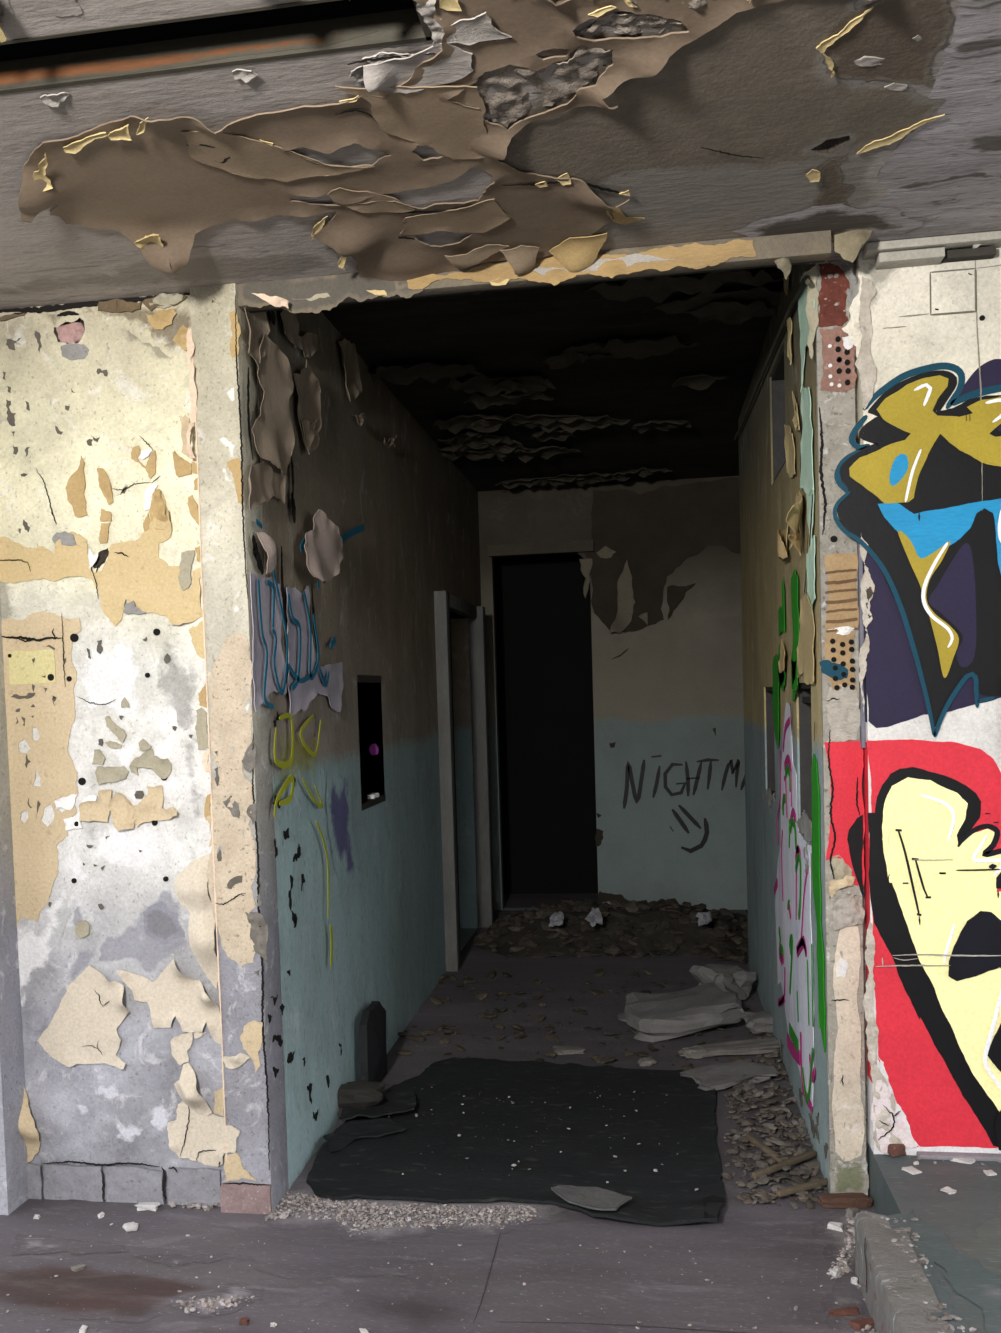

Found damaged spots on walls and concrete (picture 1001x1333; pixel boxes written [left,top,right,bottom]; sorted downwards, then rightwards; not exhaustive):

peeling [3,0,1001,742]
crack [883,314,926,329]
crack [975,260,1001,400]
peeling [0,293,344,1182]
damp [11,1234,488,1333]